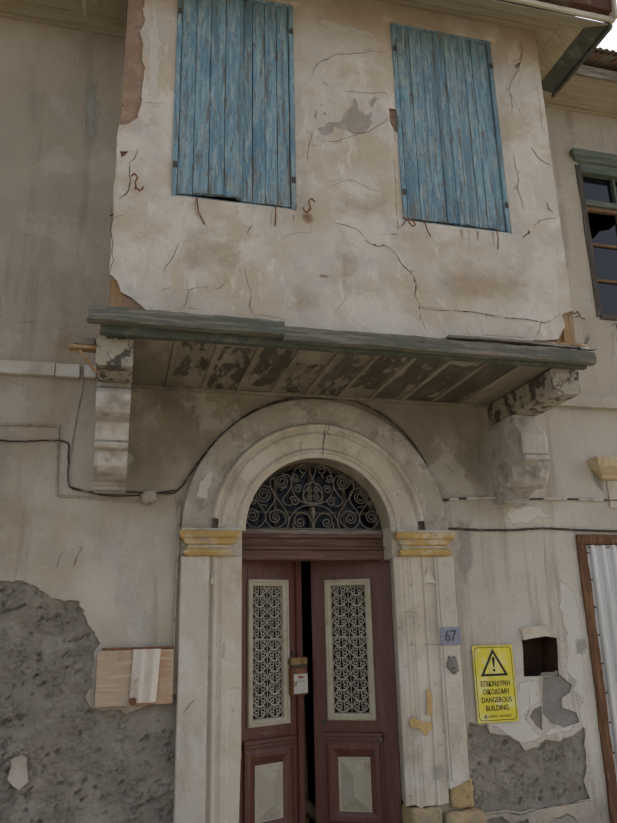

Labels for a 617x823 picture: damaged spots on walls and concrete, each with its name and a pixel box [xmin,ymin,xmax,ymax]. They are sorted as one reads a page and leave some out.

spalling [121,0,145,125]
peeling [314,97,377,135]
crack [307,91,397,158]
crack [513,161,554,224]
crack [338,179,559,337]
peeling [173,342,515,402]
spalling [0,580,177,823]
peeling [409,689,433,736]
spalling [465,582,590,823]